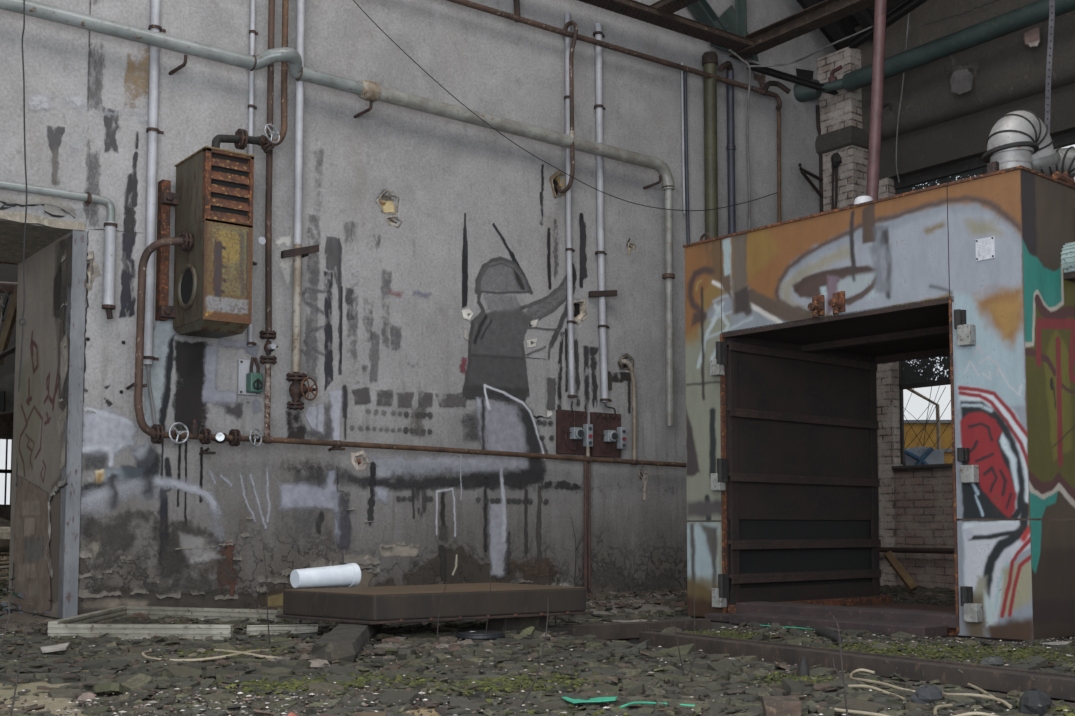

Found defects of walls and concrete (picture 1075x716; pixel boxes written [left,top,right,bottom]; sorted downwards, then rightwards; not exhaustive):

spalling [549,170,566,197]
spalling [376,190,403,228]
water stain [88,439,238,595]
flaking render [78,536,293,615]
flaking render [309,541,420,587]
water stain [374,545,559,587]